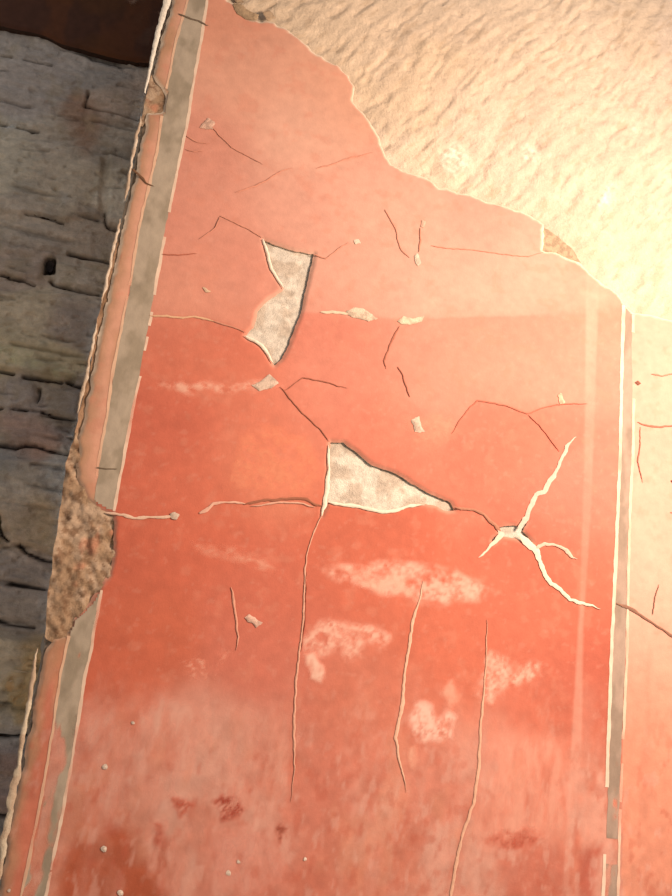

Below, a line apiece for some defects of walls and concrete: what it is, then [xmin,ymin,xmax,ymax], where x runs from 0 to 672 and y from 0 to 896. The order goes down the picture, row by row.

flaking render [245,239,313,391]
flaking render [542,228,581,263]
flaking render [45,235,121,643]
crack [105,497,324,799]
leakage [304,622,389,680]
flaking render [321,443,453,516]
leakage [330,562,482,603]
crack [394,581,424,792]
leakage [410,682,456,742]
crack [450,624,488,896]
leakage [485,653,538,703]
crack [452,400,672,637]